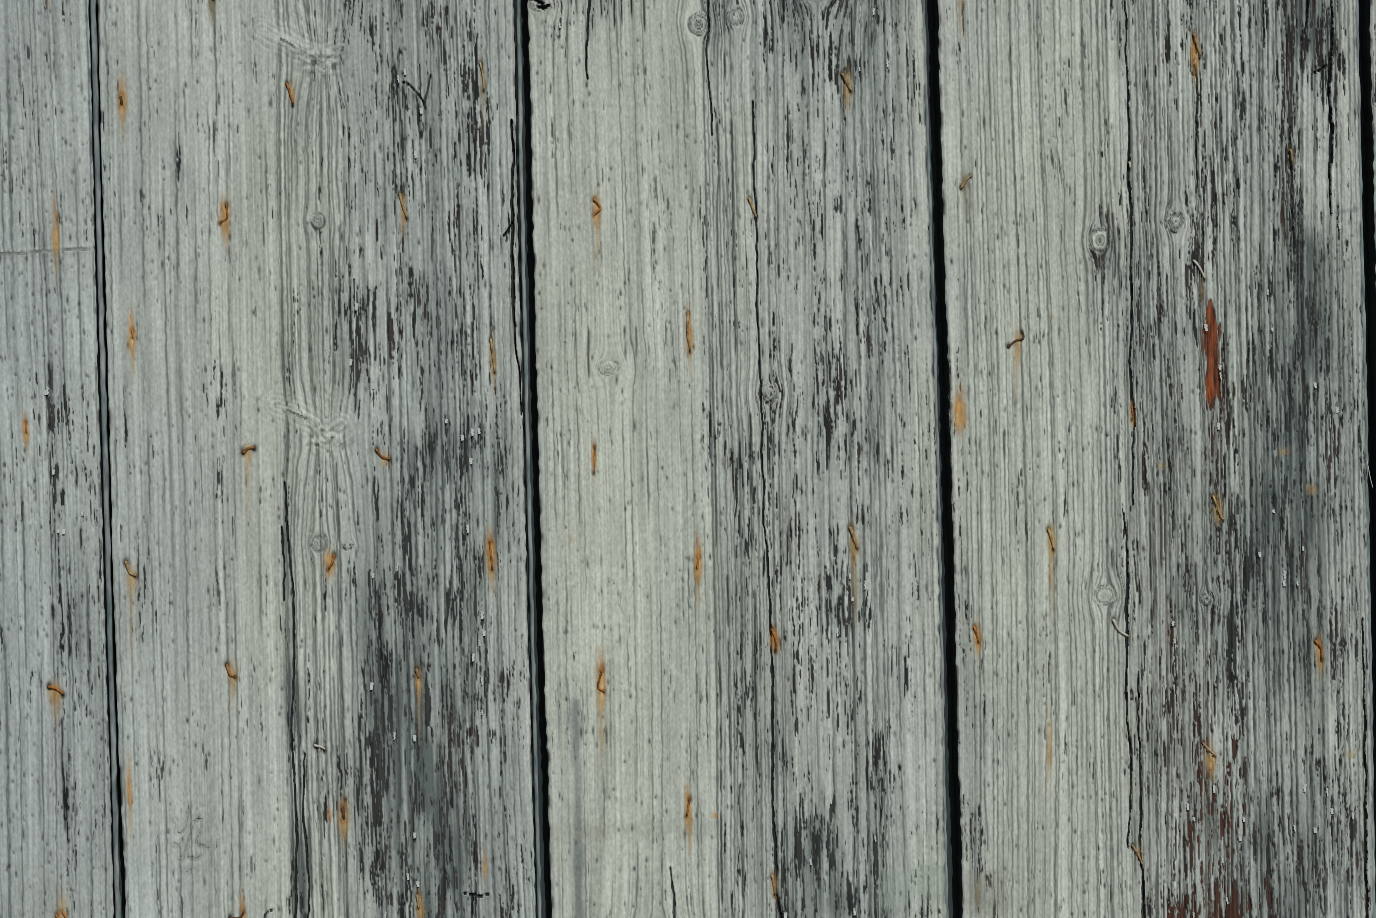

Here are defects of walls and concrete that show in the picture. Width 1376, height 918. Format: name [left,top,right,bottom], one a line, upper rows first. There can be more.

peeling [840,0,897,81]
peeling [1201,299,1222,436]
peeling [1245,205,1362,443]
peeling [337,410,501,918]
peeling [819,558,868,661]
peeling [1212,460,1334,691]
peeling [776,775,884,918]
peeling [1167,727,1358,918]